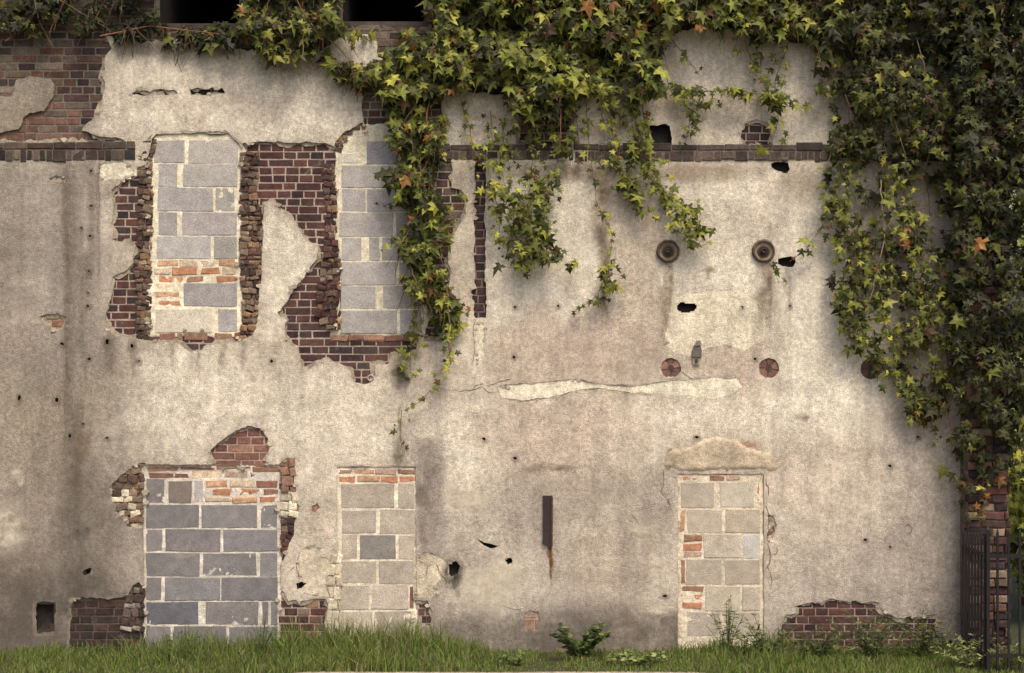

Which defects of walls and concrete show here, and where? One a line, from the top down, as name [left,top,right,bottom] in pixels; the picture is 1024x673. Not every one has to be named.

flaking render [0,1,178,143]
flaking render [352,86,390,133]
flaking render [240,1,532,94]
flaking render [728,1,959,62]
flaking render [96,140,445,384]
flaking render [433,155,488,368]
crack [440,371,703,414]
flaking render [110,463,149,530]
crack [765,483,778,595]
flaking render [66,582,149,652]
flaking render [411,552,452,627]
flaking render [777,598,952,652]